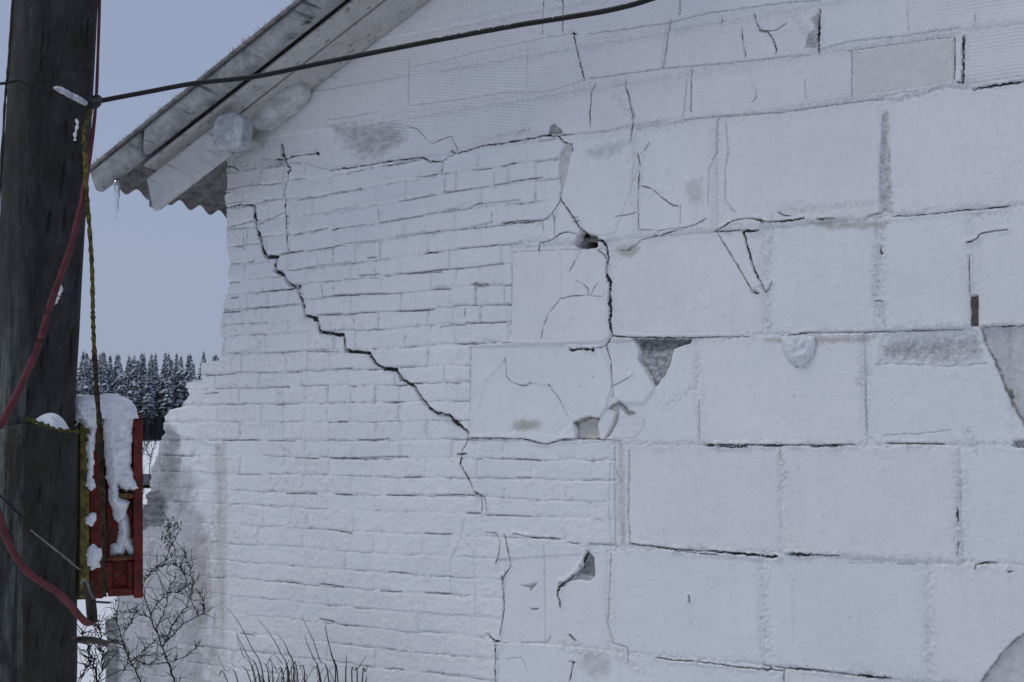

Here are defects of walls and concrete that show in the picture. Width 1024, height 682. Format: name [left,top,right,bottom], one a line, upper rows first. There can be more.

crack [721,16,785,58]
crack [815,11,823,52]
crack [504,84,832,397]
crack [225,0,620,677]
spalling [637,339,692,385]
flaking render [982,328,1024,422]
flaking render [575,402,644,439]
leakage [143,491,167,528]
spalling [563,552,595,586]